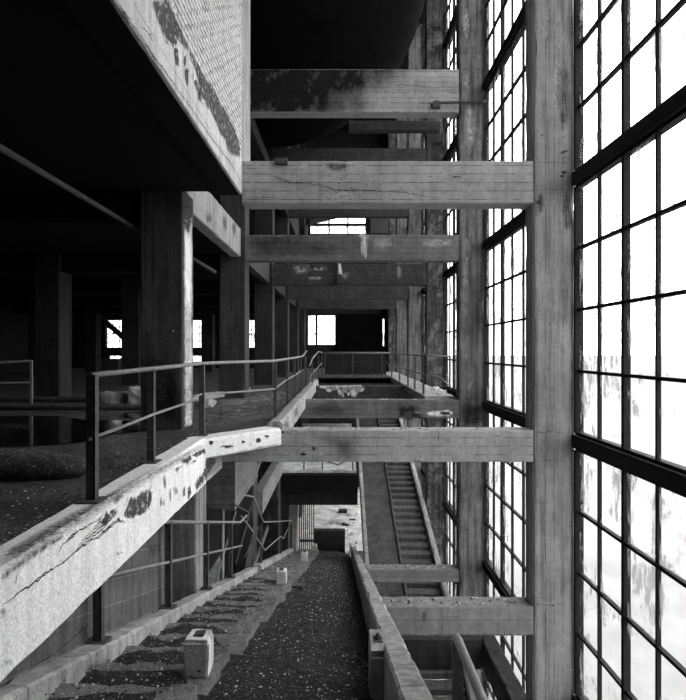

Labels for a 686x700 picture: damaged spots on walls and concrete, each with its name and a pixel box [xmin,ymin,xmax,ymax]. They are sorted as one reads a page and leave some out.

flaking render [153,0,240,158]
crack [121,5,440,198]
crack [4,508,124,604]
peeling [100,485,154,525]